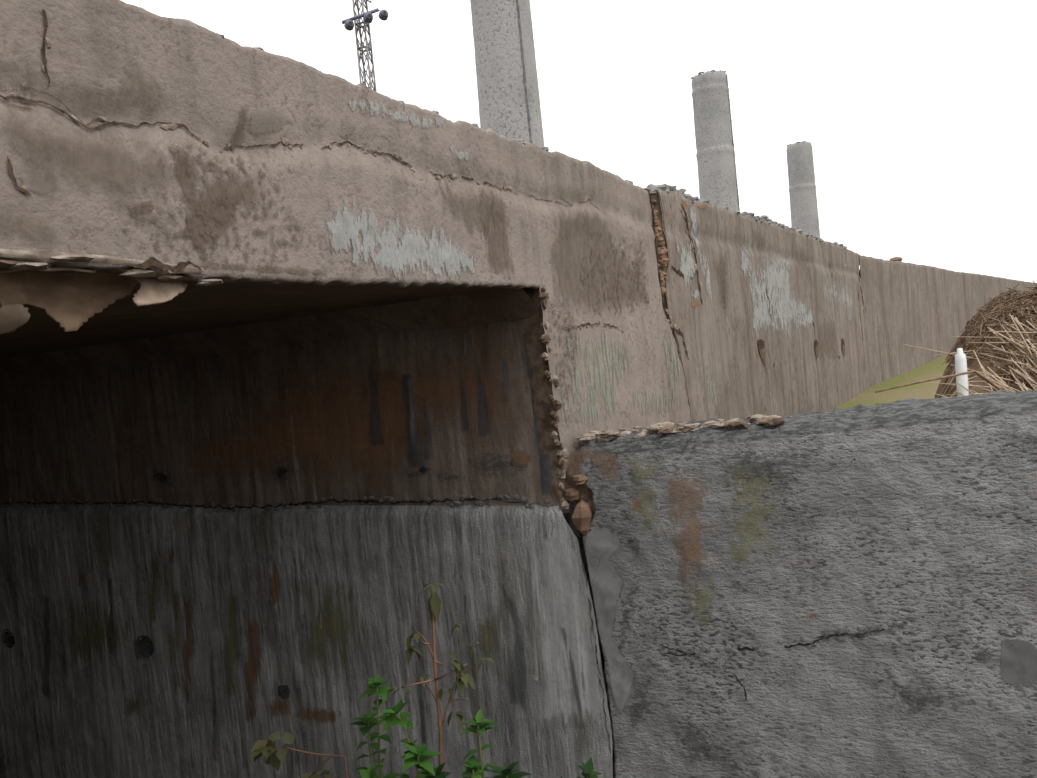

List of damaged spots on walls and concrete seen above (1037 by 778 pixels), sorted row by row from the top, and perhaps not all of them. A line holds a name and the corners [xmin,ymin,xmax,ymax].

spalling [521,287,596,519]
crack [646,189,703,416]
spalling [576,414,792,442]
leakage [1000,640,1037,684]